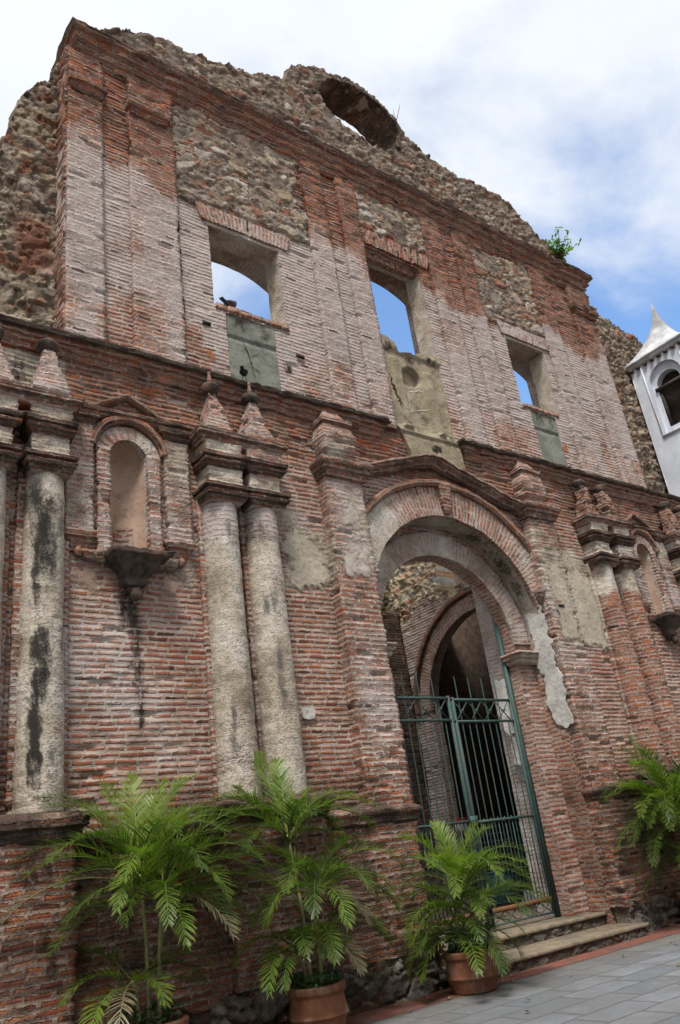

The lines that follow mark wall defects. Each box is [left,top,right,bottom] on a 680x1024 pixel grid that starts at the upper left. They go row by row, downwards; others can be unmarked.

crack [389,372,454,442]
leakage [21,479,64,605]
flaking render [281,509,330,594]
flaking render [339,497,371,577]
leakage [26,624,64,798]
leakage [119,591,147,728]
flaking render [525,549,608,728]